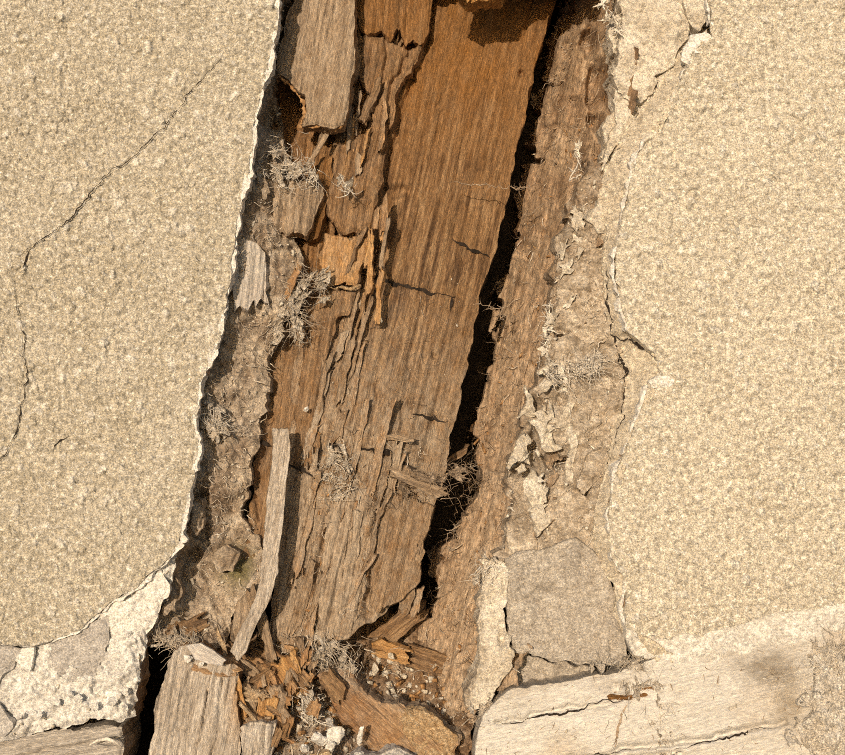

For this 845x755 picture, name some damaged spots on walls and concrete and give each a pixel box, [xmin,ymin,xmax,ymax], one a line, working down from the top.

crack [0,59,221,462]
spalling [0,0,282,742]
spalling [417,0,845,723]
peeling [89,737,122,748]